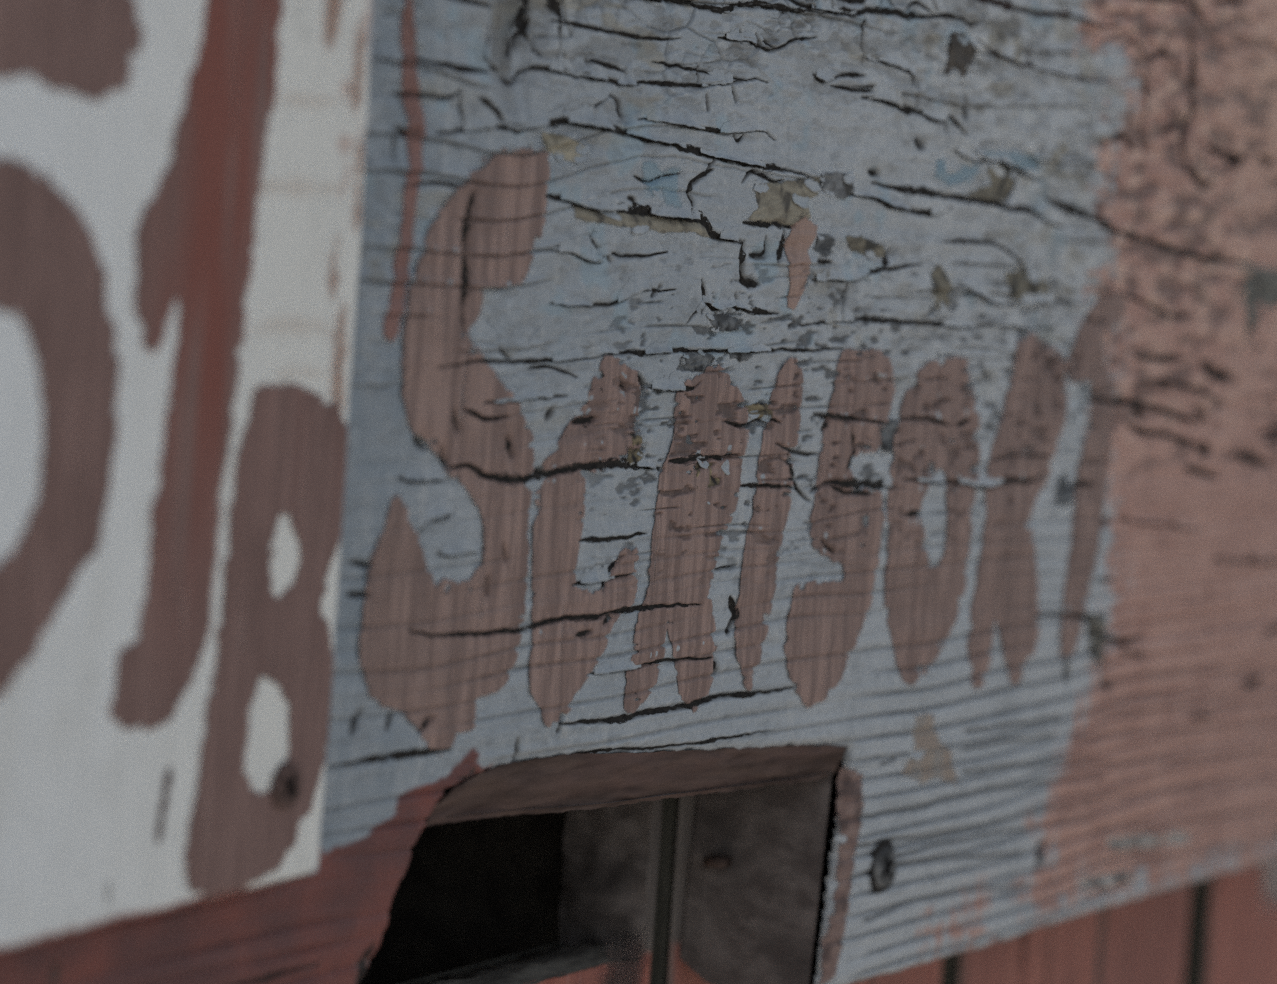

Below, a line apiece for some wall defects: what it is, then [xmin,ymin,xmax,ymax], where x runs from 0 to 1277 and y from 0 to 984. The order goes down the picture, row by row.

peeling [944,32,978,79]
peeling [572,162,711,238]
peeling [749,172,855,226]
peeling [935,148,1042,201]
peeling [813,233,885,262]
crack [392,0,1277,556]
peeling [931,265,953,310]
peeling [1005,268,1050,302]
peeling [706,312,742,333]
crack [1033,612,1144,689]
peeling [902,712,959,785]
peeling [818,768,864,984]